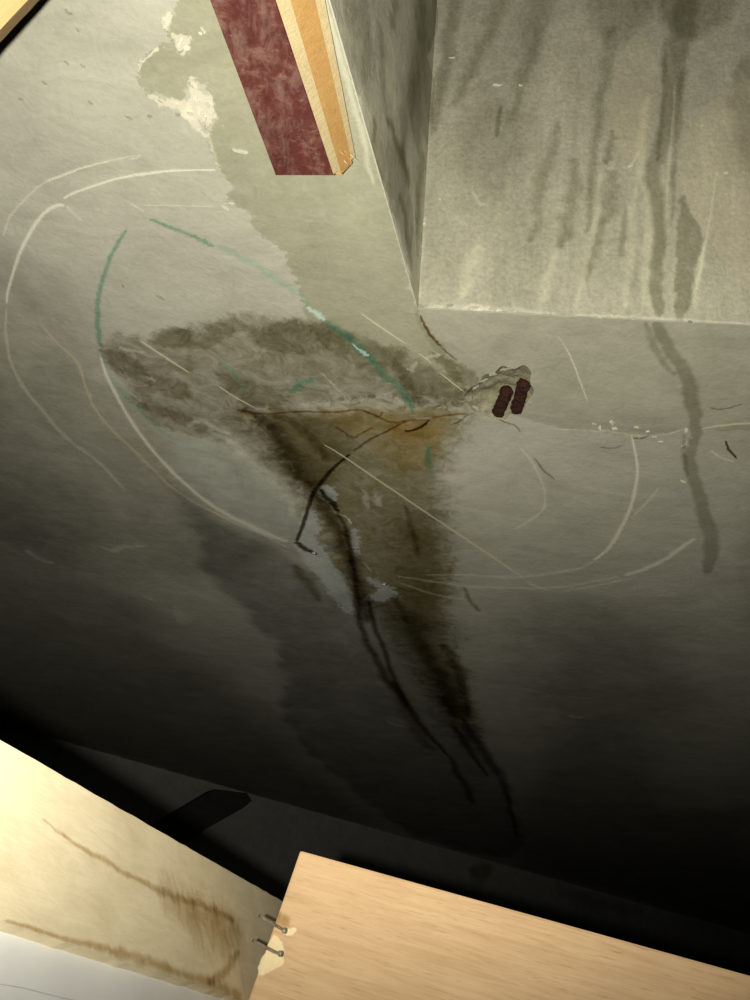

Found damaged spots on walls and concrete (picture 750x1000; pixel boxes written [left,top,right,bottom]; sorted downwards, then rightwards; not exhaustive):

spalling [462,365,534,421]
crack [295,454,350,555]
damp [249,412,445,753]